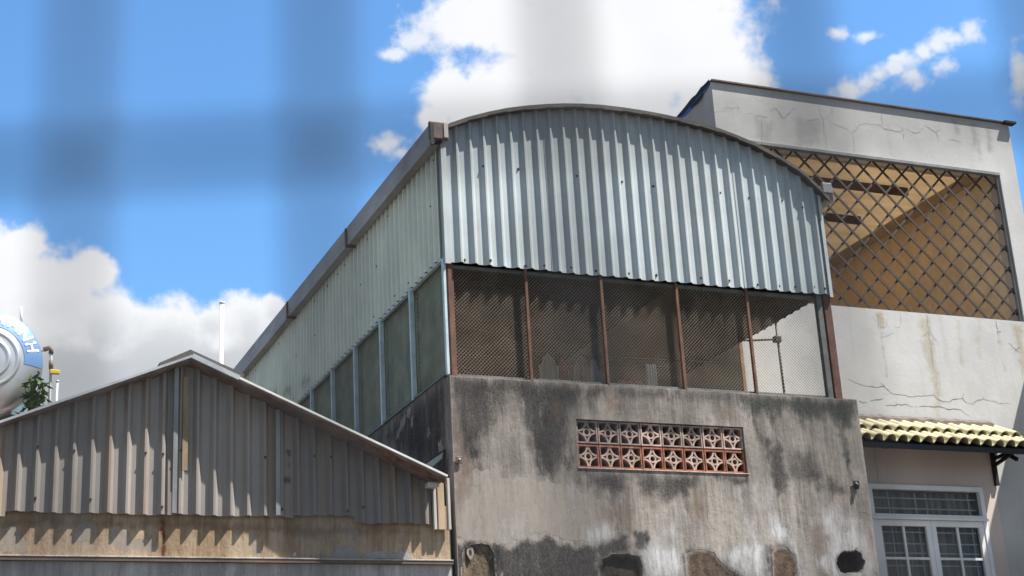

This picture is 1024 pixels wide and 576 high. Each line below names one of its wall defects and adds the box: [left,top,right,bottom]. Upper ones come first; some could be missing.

crack [858,383,1011,416]
leakage [456,380,570,478]
leakage [642,476,697,499]
leakage [492,536,581,576]
leakage [607,523,682,576]
spalling [836,550,852,574]